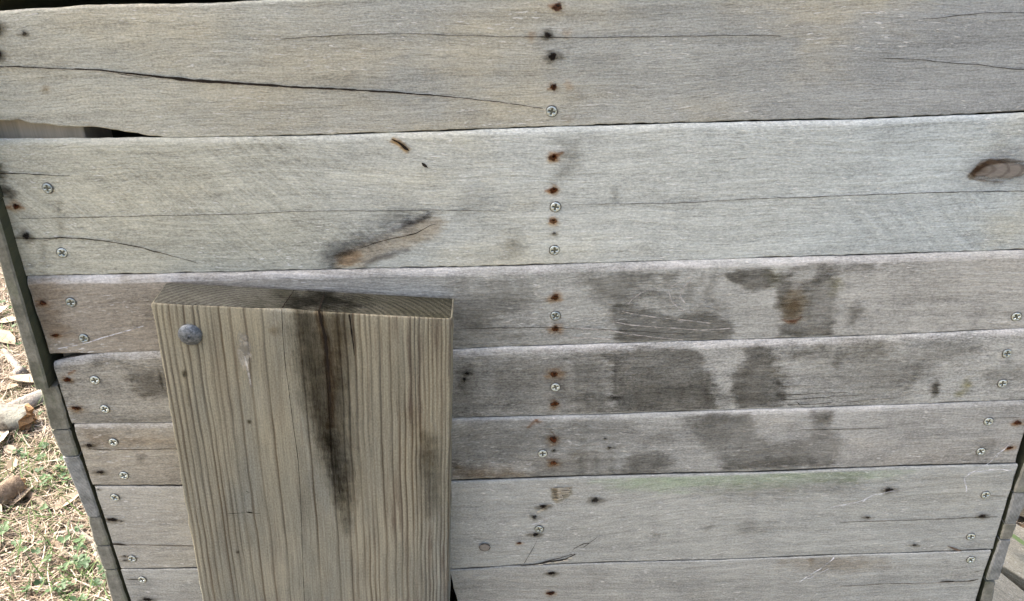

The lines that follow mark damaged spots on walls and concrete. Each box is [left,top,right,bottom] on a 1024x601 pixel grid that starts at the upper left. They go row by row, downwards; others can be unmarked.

crack [0,66,543,109]
crack [20,210,361,263]
water stain [287,292,360,309]
crack [521,538,596,566]